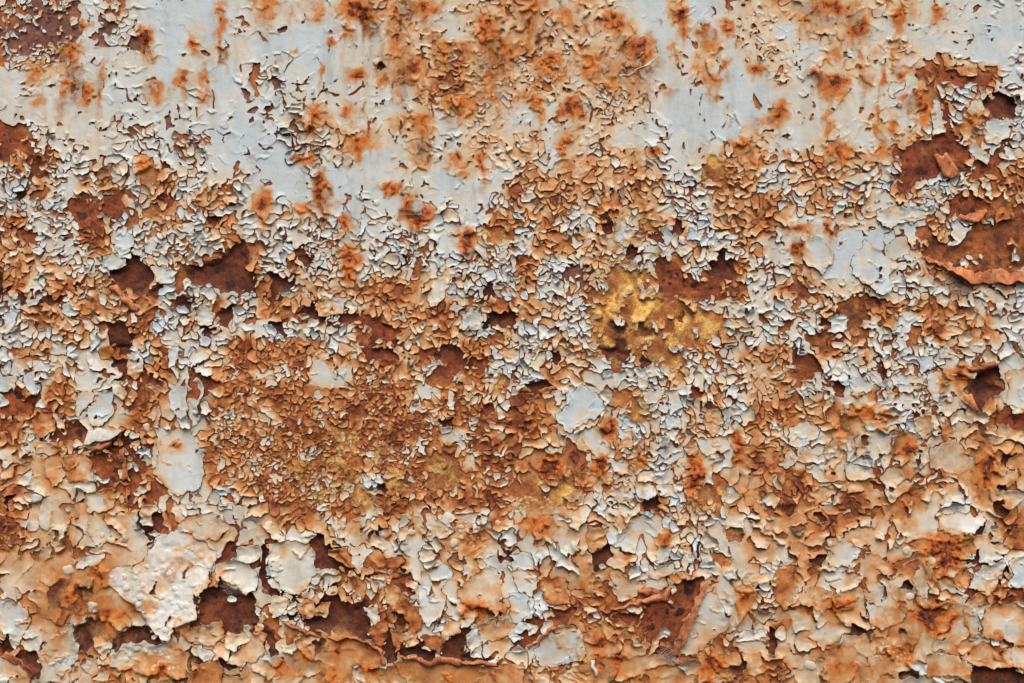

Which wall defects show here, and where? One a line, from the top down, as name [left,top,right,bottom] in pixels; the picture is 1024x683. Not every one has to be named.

peeling [0,0,85,71]
peeling [96,0,137,46]
rust [0,119,57,249]
peeling [248,51,345,177]
rust [793,0,1024,274]
rust [623,216,737,304]
peeling [801,235,835,275]
peeling [1007,237,1024,271]
peeling [372,338,394,349]
rust [268,270,517,383]
rust [186,531,503,683]
rust [586,574,712,683]